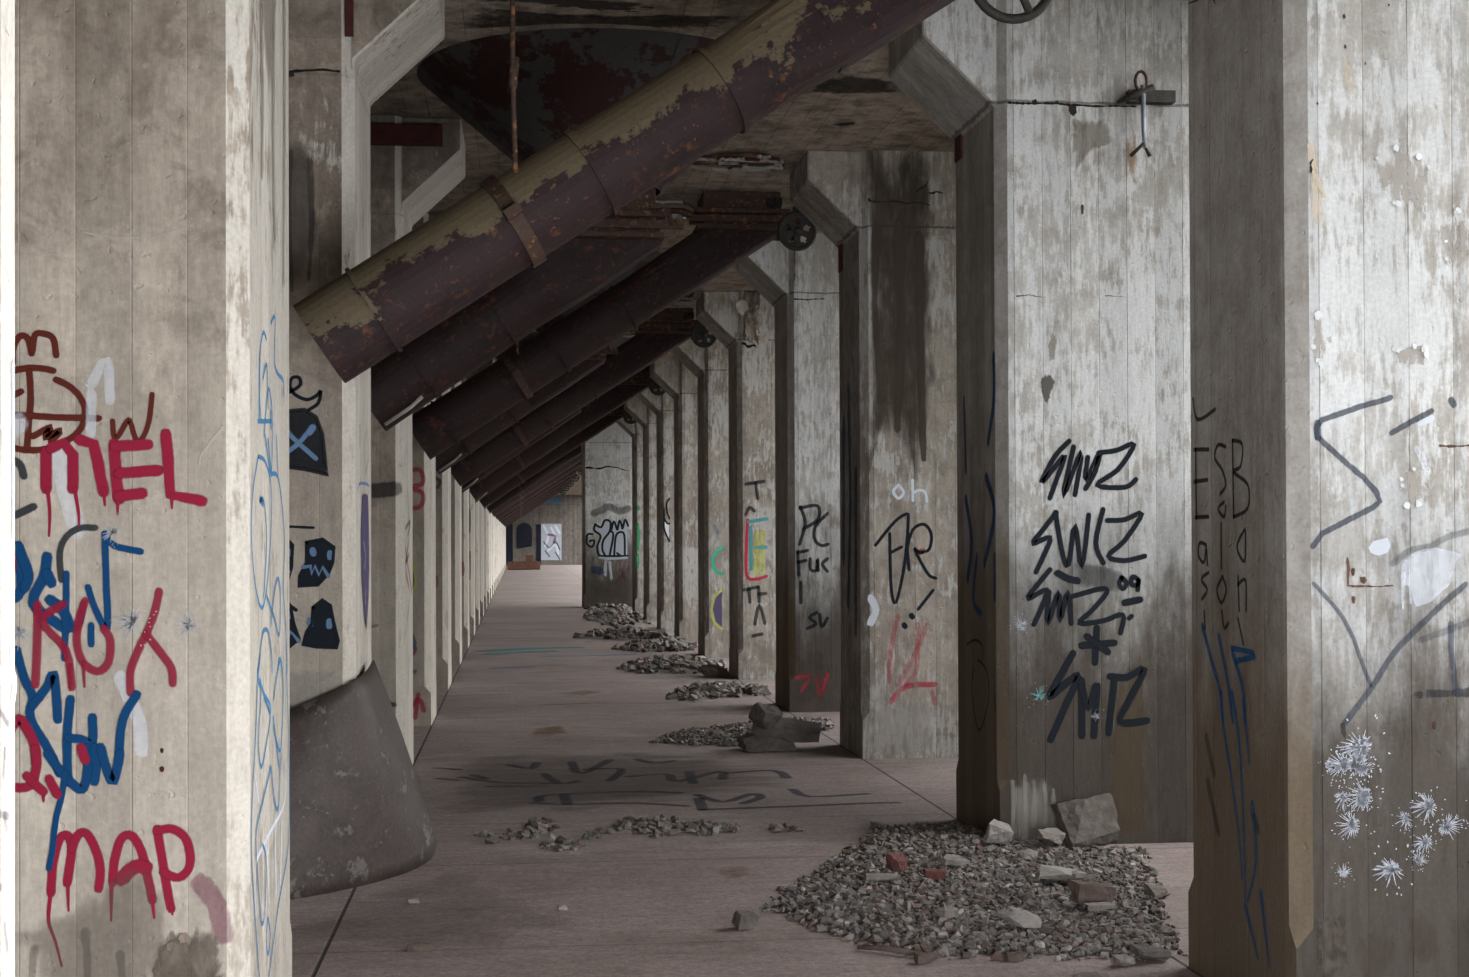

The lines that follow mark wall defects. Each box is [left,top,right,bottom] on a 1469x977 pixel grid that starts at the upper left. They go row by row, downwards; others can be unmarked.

crack [289,66,340,74]
water stain [867,150,934,470]